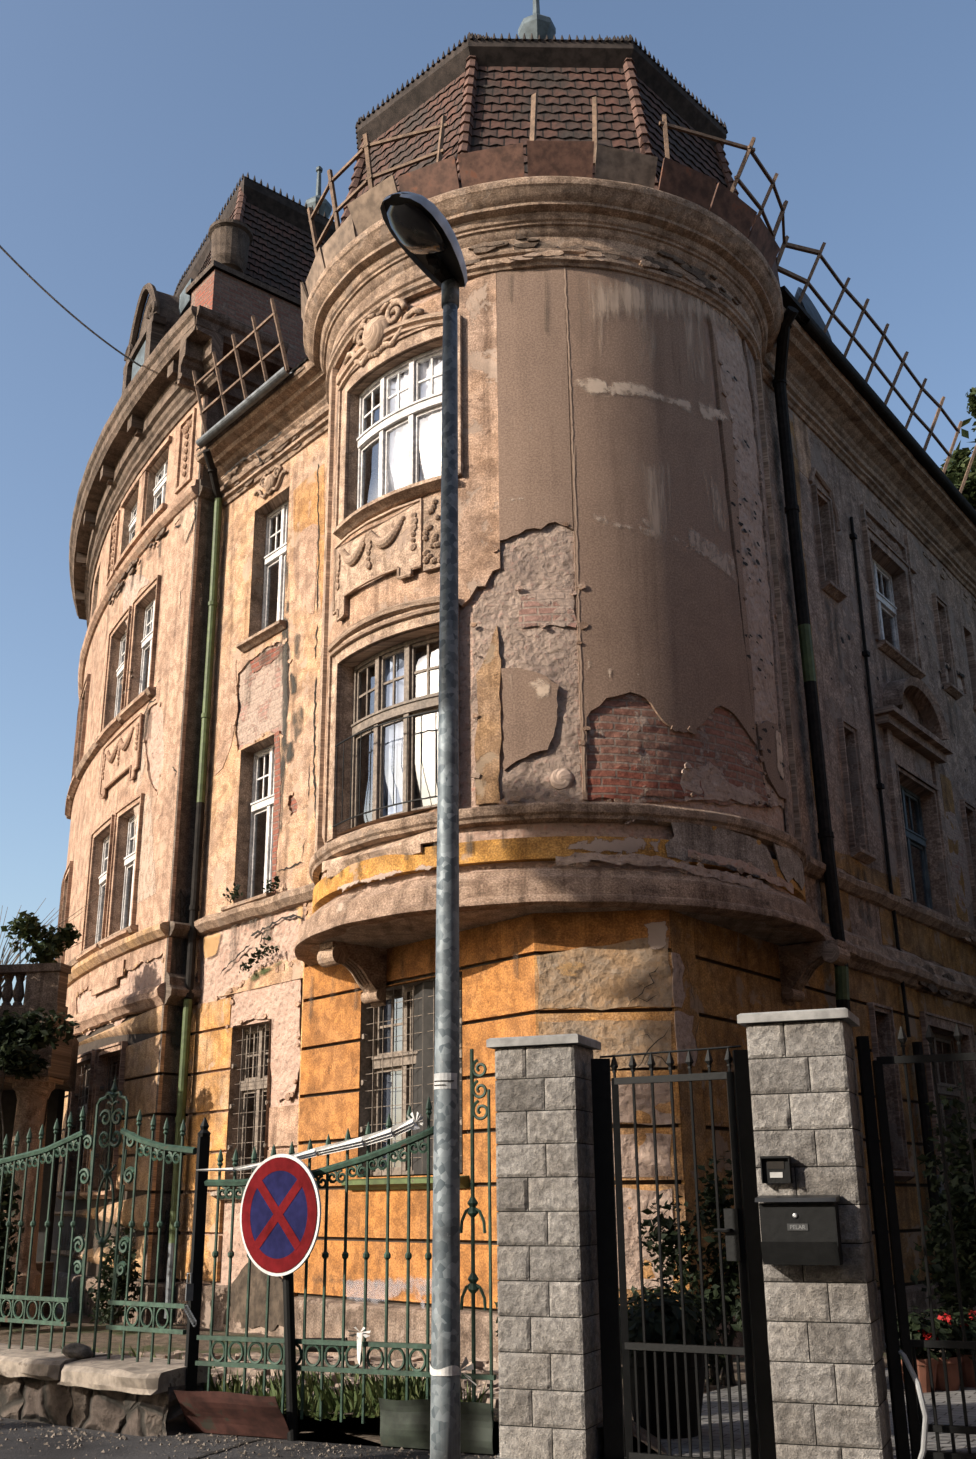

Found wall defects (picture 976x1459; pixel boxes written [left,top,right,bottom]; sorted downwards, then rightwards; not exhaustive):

peeling [465,236,620,267]
spalling [470,250,791,867]
spalling [232,638,293,750]
peeling [756,840,805,890]